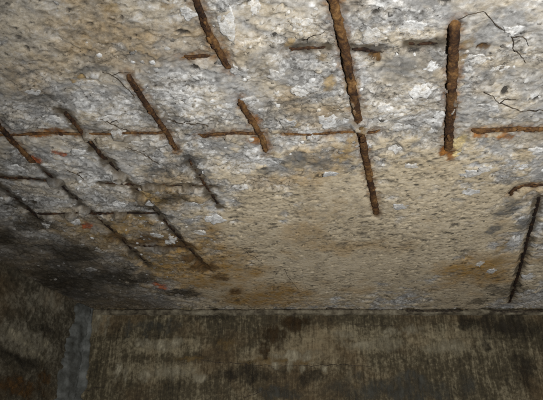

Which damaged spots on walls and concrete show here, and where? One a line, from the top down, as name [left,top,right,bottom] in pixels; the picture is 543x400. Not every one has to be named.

crack [459,11,529,63]
crack [484,92,543,112]
spalling [0,0,543,310]
damp [259,317,308,359]